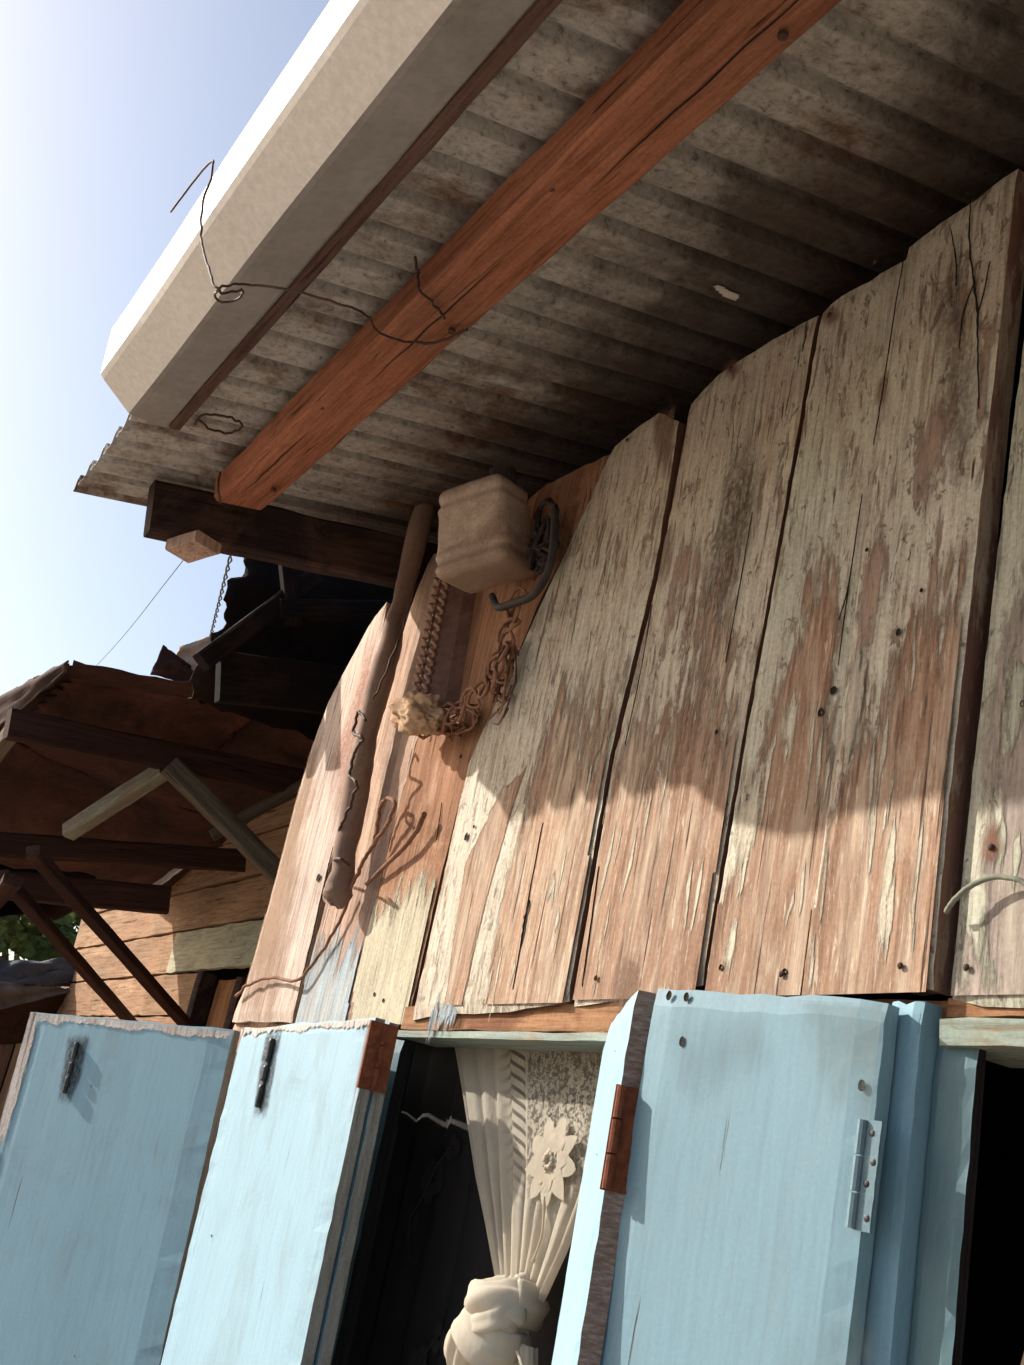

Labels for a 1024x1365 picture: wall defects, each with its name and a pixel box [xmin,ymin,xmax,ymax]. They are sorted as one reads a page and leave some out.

crack [950,197,991,408]
peeling [912,375,958,515]
peeling [427,515,968,1040]
peeling [951,577,1024,999]
peeling [0,868,436,1145]